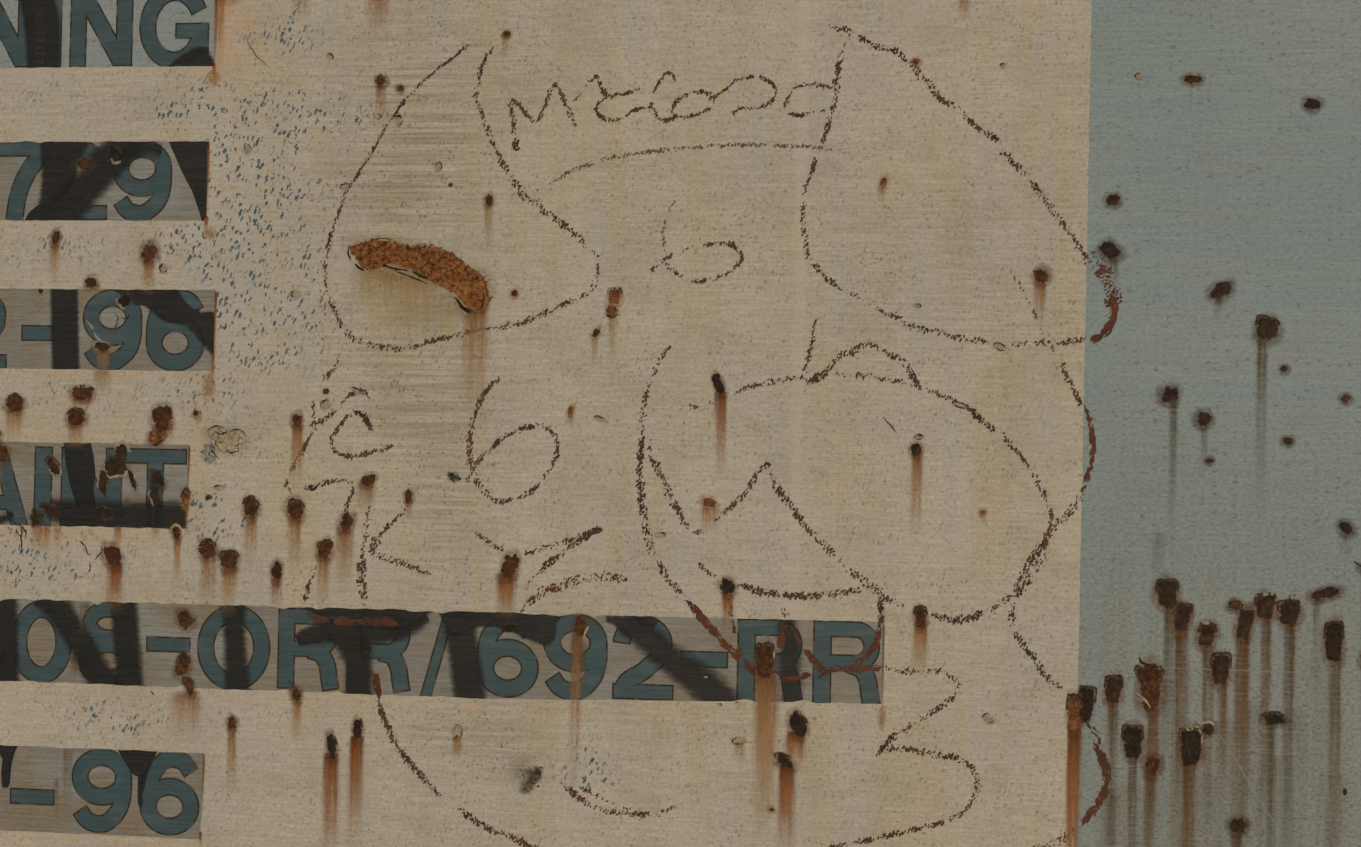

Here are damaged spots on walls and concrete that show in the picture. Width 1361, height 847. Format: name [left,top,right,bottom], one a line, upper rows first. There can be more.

corrosion [347,238,493,351]
corrosion [66,384,95,437]
corrosion [149,406,173,446]
corrosion [712,373,726,434]
corrosion [103,527,122,590]
corrosion [198,538,240,591]
corrosion [242,495,260,530]
corrosion [316,513,355,575]
corrosion [755,641,808,825]
corrosion [1066,578,1340,847]
corrosion [1323,620,1345,743]
corrosion [324,719,363,819]